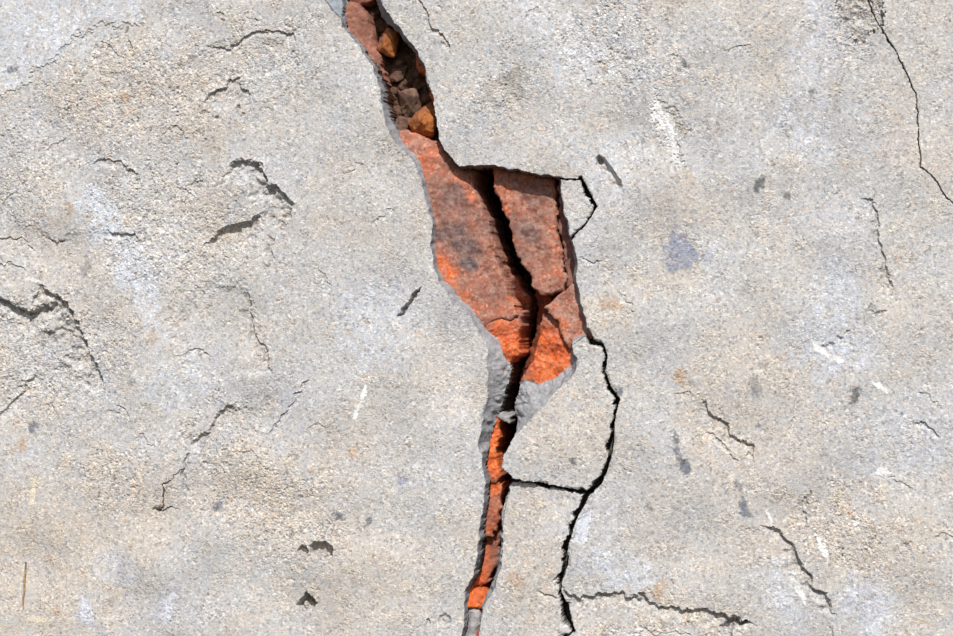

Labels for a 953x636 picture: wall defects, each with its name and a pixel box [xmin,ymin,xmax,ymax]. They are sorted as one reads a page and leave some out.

crack [867,0,953,204]
crack [325,0,620,636]
peeling [570,508,594,544]